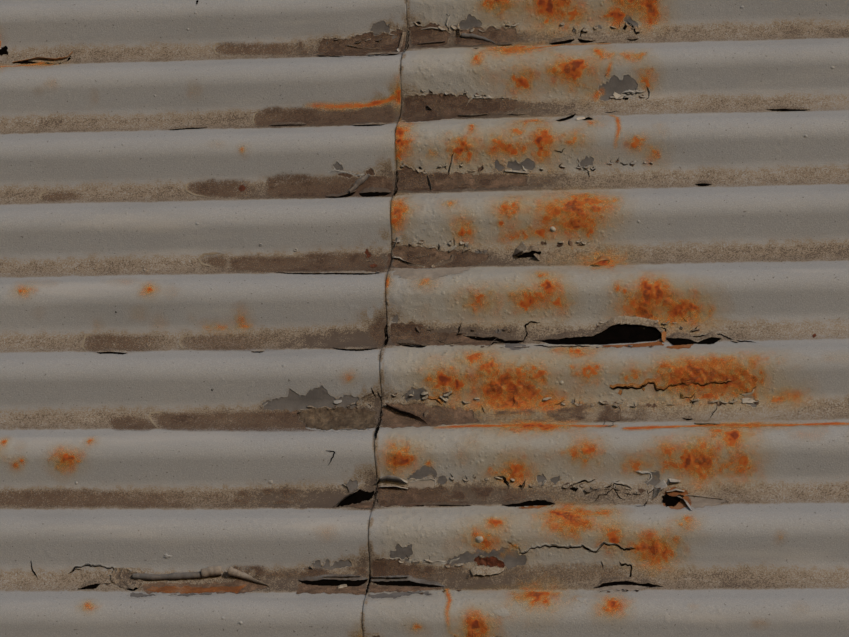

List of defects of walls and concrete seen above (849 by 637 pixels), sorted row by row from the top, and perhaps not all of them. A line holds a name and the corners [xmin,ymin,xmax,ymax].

corrosion [507,194,616,240]
corrosion [616,278,711,324]
peeling [388,312,757,352]
peeling [259,383,482,432]
corrosion [427,353,563,411]
crack [601,378,756,426]
corrosion [654,357,764,399]
corrosion [623,422,849,483]
peeling [334,463,729,511]
crack [507,539,636,554]
peeling [78,579,113,589]
peeling [127,566,270,599]